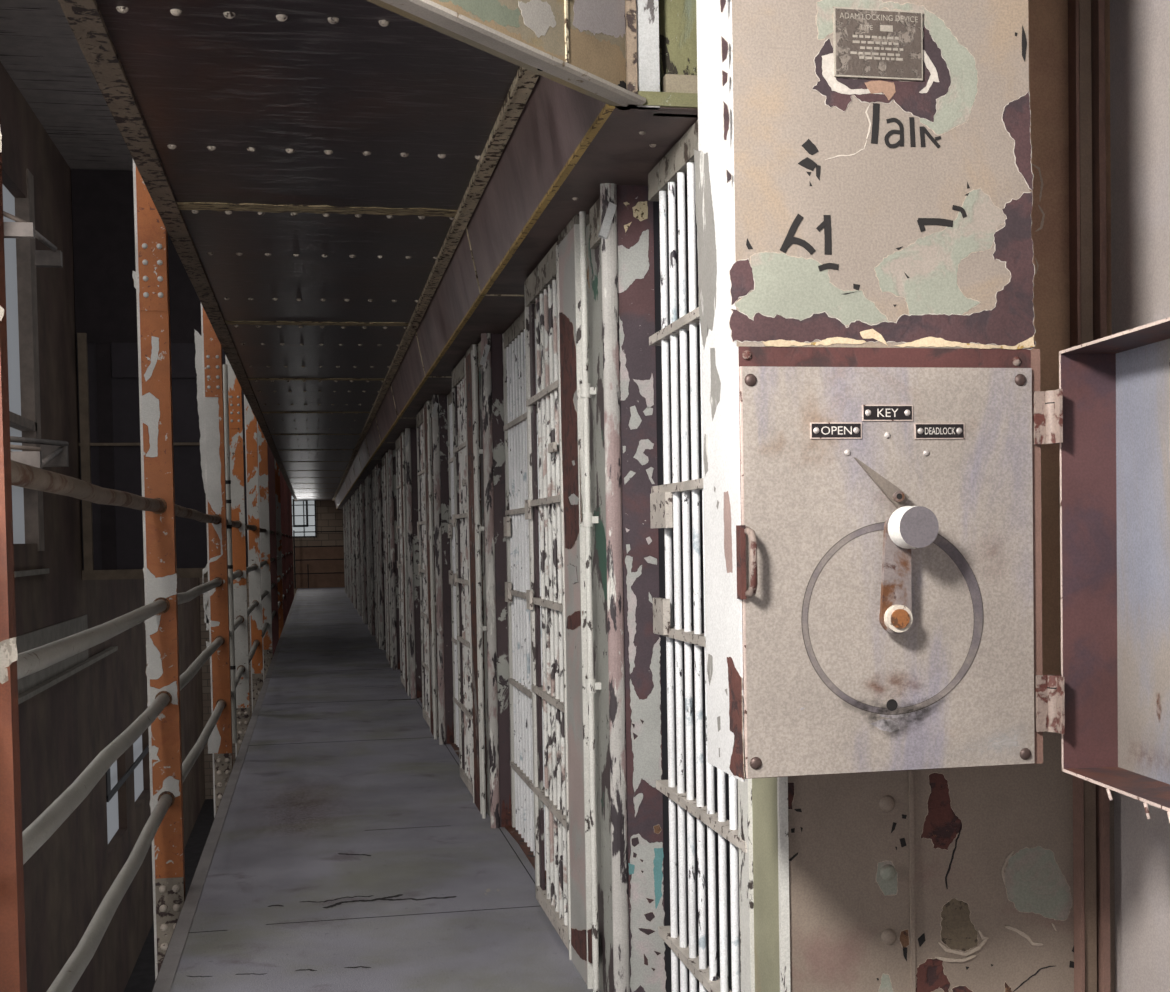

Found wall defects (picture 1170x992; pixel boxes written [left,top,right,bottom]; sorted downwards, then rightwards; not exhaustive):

peeling [432,0,626,89]
peeling [721,36,729,87]
peeling [694,91,1045,421]
peeling [142,336,160,458]
peeling [559,312,582,550]
peeling [619,317,655,485]
peeling [714,486,733,573]
peeling [142,568,178,707]
peeling [625,527,663,817]
peeling [628,833,667,992]
peeling [920,772,963,851]
crack [945,825,961,889]